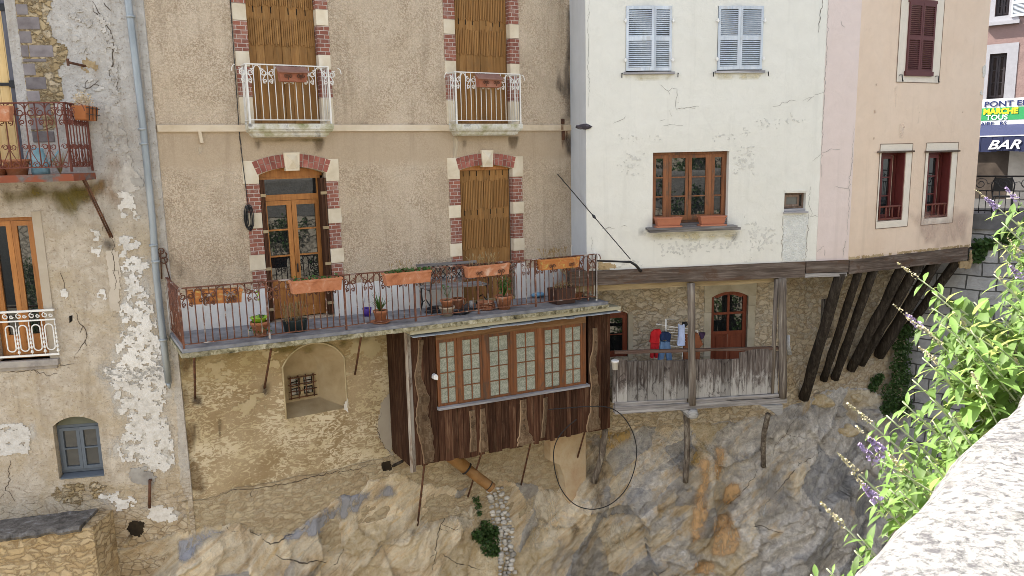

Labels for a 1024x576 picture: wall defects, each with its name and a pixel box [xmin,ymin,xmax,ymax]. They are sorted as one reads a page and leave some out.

spalling [15,0,104,132]
crack [773,0,854,257]
water stain [10,184,101,212]
crack [11,313,87,376]
peeling [99,235,176,473]
peeling [0,423,35,456]
peeling [147,505,179,523]